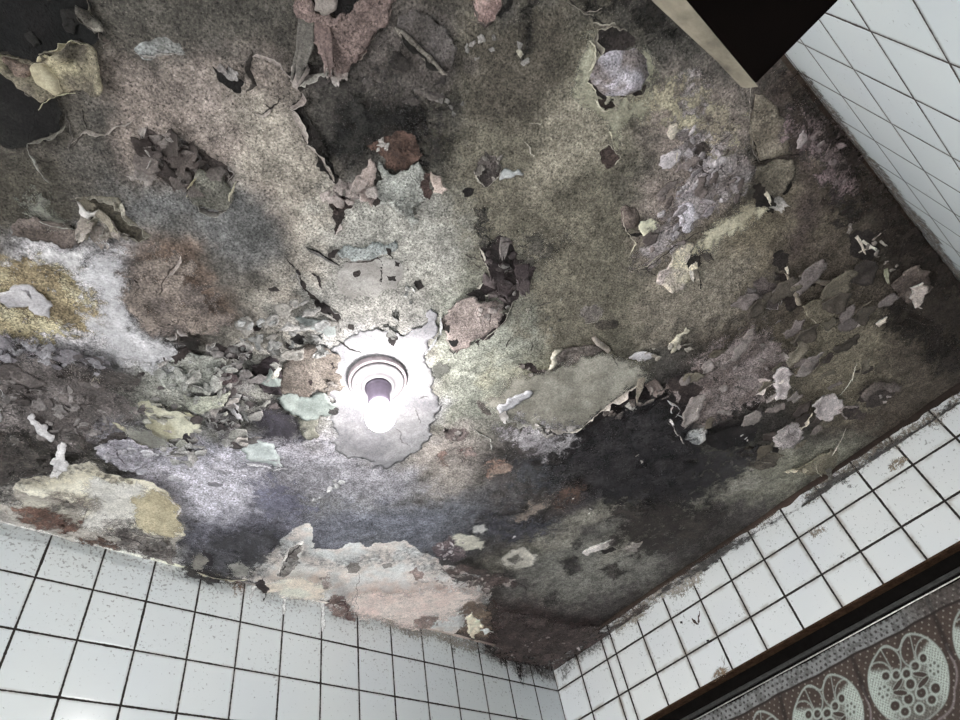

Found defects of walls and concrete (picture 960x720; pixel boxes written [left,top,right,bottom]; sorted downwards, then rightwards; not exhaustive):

spalling [0,0,111,184]
peeling [126,127,237,218]
peeling [212,0,513,235]
spalling [572,25,660,169]
peeling [628,68,796,294]
water stain [35,242,177,392]
peeling [0,185,563,565]
peeling [477,229,933,480]
peeling [241,523,527,641]
water stain [370,393,960,685]